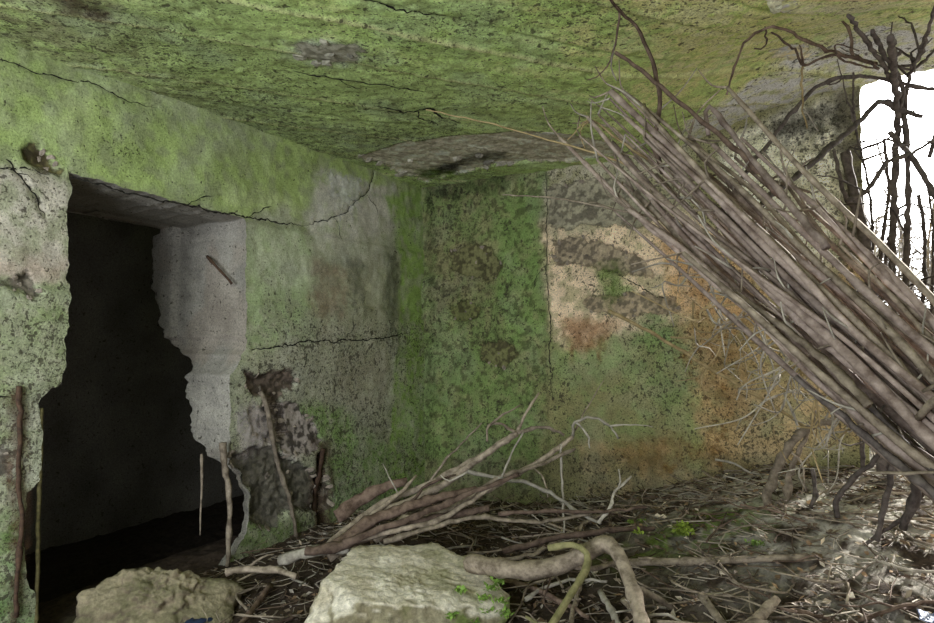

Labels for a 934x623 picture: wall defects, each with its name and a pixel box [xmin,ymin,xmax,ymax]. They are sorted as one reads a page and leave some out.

crack [368,0,446,16]
crack [0,59,157,108]
peeling [358,131,613,182]
crack [253,322,409,368]
corrosion [12,386,44,623]
corrosion [311,441,334,525]